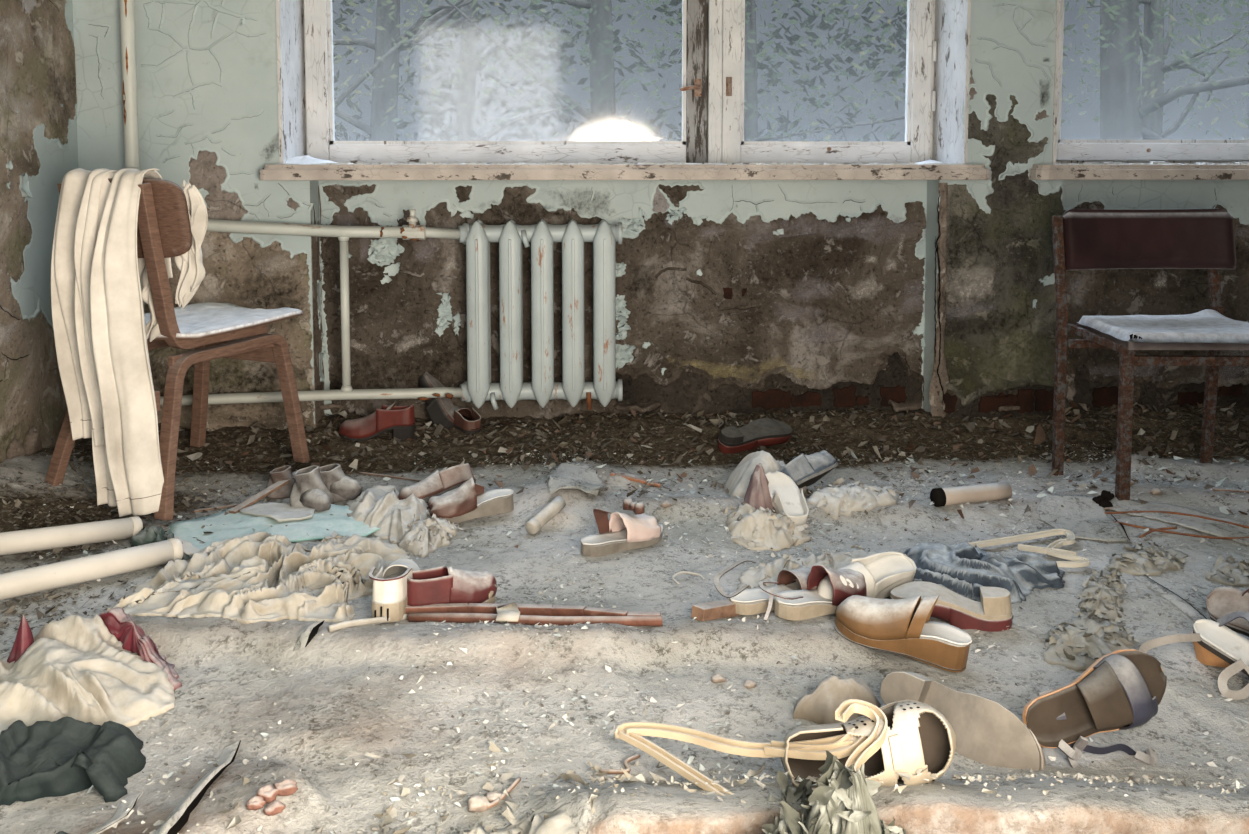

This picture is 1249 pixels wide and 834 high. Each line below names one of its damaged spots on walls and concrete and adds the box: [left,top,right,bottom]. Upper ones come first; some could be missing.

crack [975,2,1053,87]
peeling [0,0,77,463]
peeling [169,65,1249,431]
crack [0,302,28,382]
peeling [148,346,195,429]